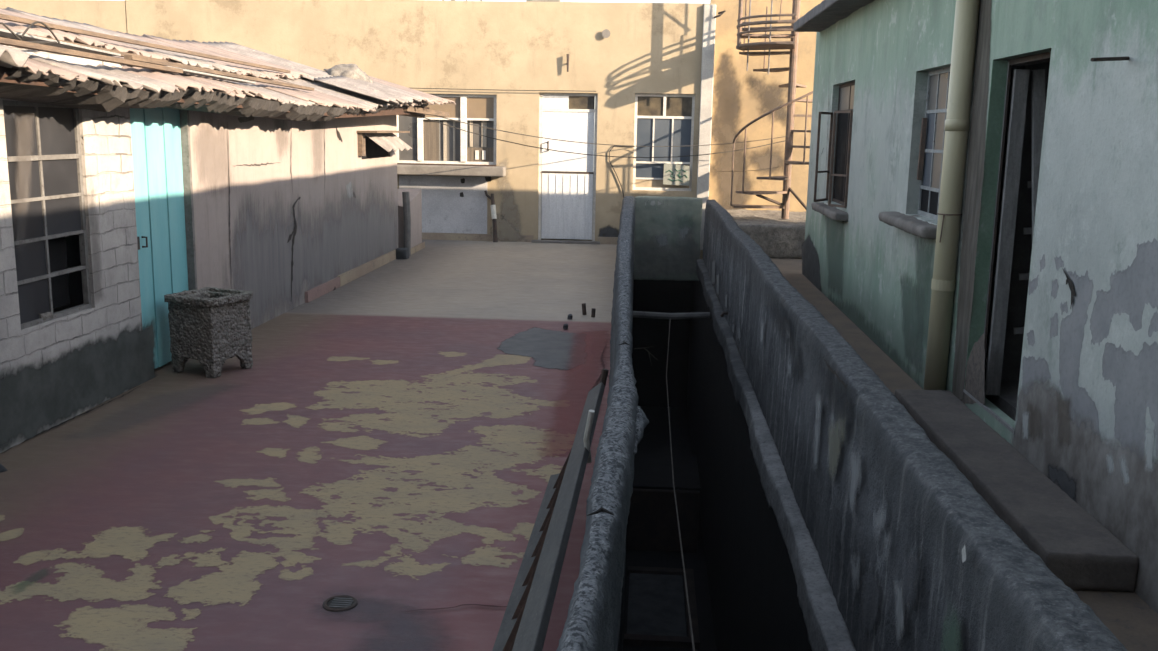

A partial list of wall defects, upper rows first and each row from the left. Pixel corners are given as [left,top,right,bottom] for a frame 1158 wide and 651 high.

crack [227,121,343,300]
damp [0,321,156,451]
peeling [0,351,576,651]
spalling [1012,238,1158,614]